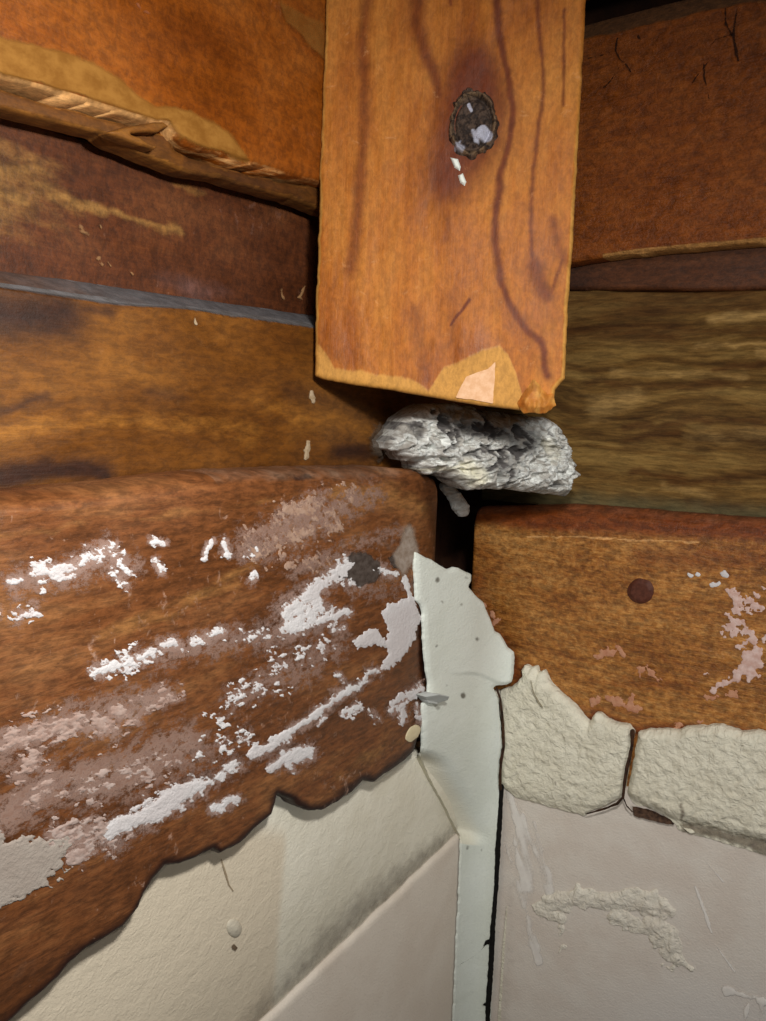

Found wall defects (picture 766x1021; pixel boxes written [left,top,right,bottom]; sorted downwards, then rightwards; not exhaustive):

peeling [703,570,766,701]
peeling [593,645,626,660]
peeling [636,664,662,682]
peeling [0,481,449,909]
peeling [589,693,643,713]
crack [585,729,635,814]
spalling [632,806,695,833]